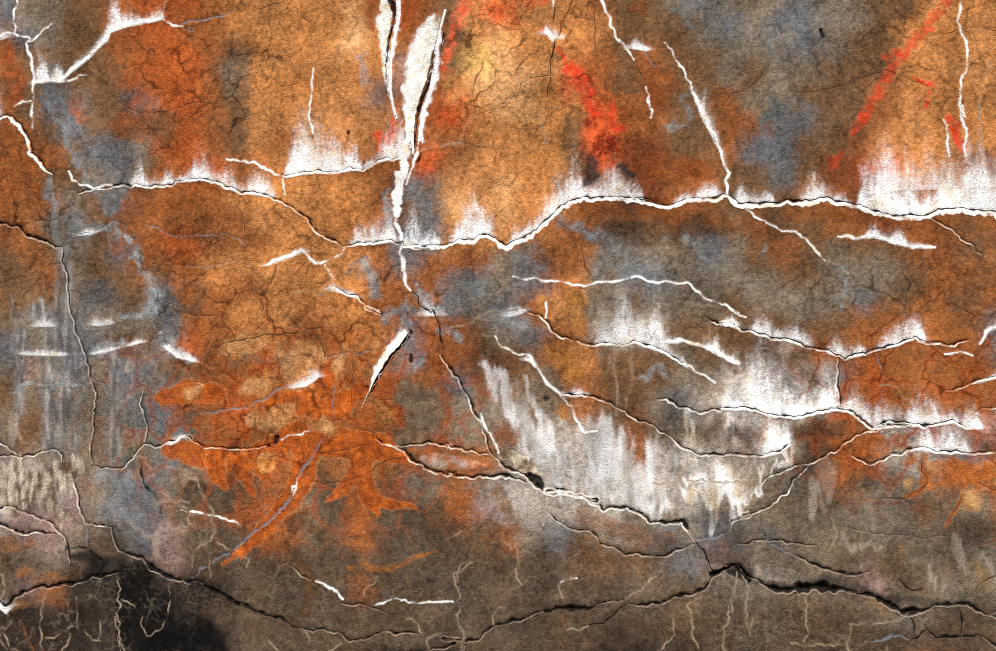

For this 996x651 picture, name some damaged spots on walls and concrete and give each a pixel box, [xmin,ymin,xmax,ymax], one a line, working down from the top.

crack [0,0,233,176]
damp [0,0,290,651]
damp [223,347,329,390]
corrosion [151,323,420,566]
damp [123,0,471,198]
peeling [360,326,454,457]
peeling [374,0,445,155]
crack [0,220,996,651]
crack [67,0,996,486]
damp [317,108,996,598]
damp [662,65,996,251]
corrosion [337,536,439,575]